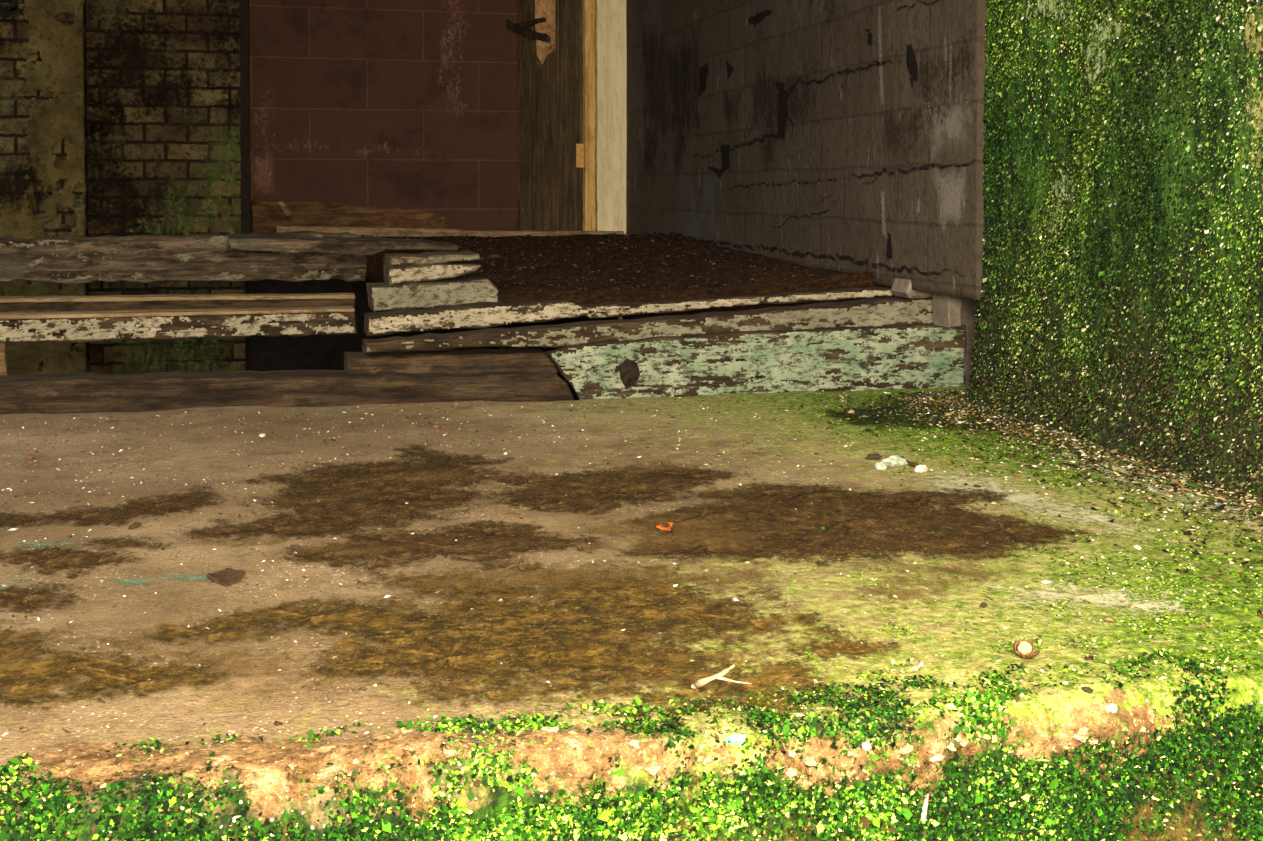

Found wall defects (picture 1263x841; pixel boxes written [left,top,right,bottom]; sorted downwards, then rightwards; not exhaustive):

water stain [86,0,273,237]
crack [648,58,898,170]
water stain [0,150,47,215]
peeling [0,239,117,281]
crack [642,158,976,276]
peeling [0,255,966,400]